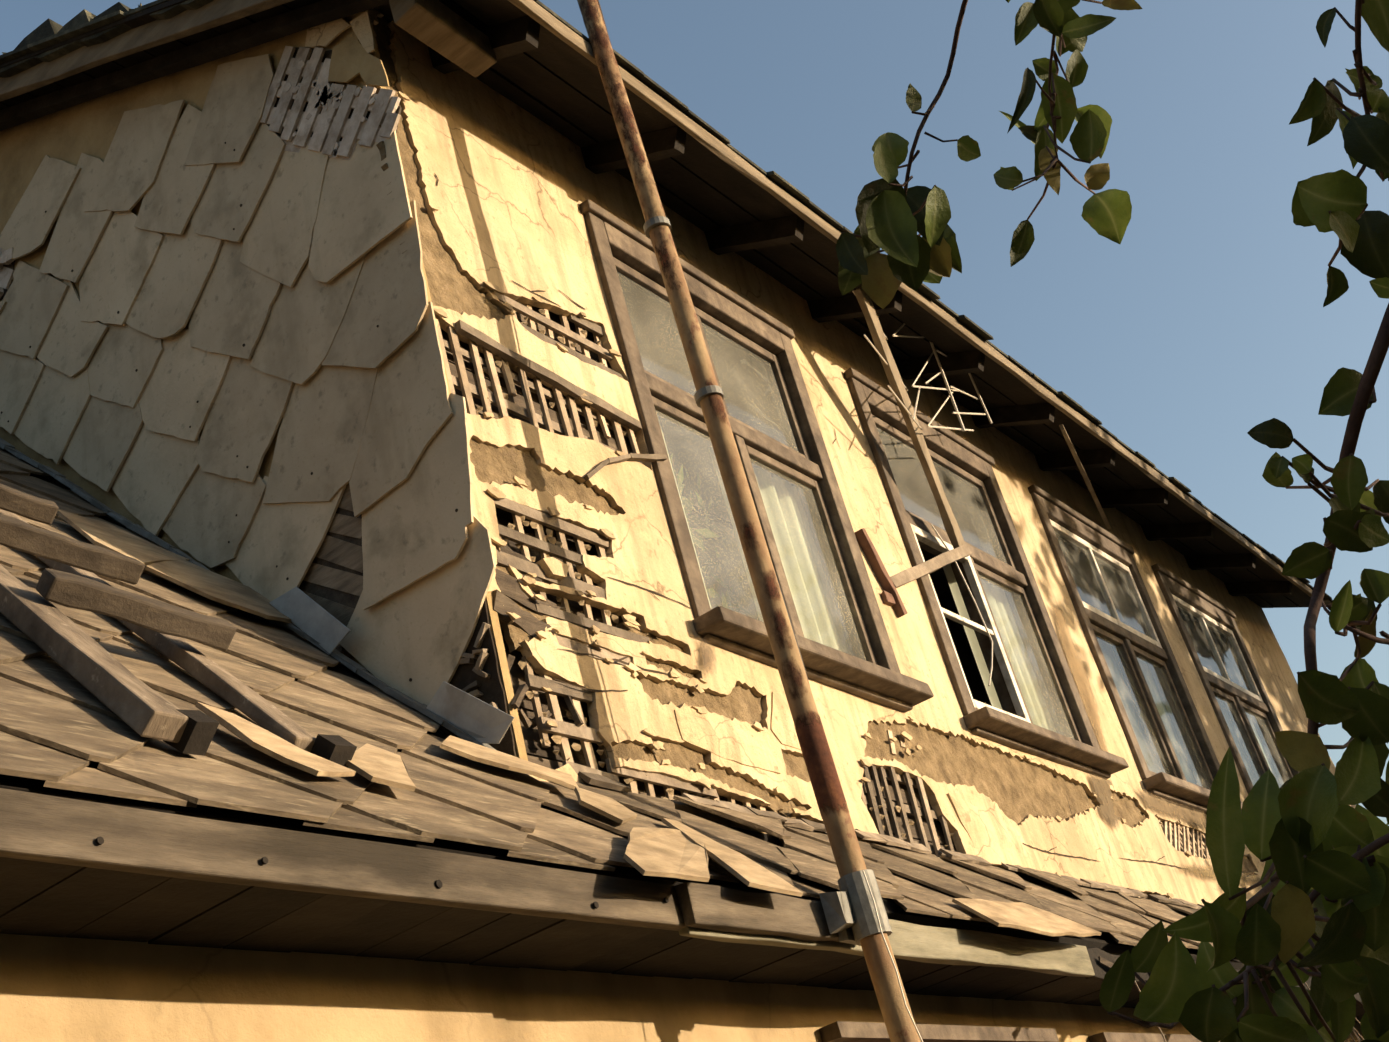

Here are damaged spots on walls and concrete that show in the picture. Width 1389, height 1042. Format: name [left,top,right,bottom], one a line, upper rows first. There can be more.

flaking render [305,10,517,320]
flaking render [469,439,619,540]
flaking render [496,565,561,652]
flaking render [860,716,1163,827]